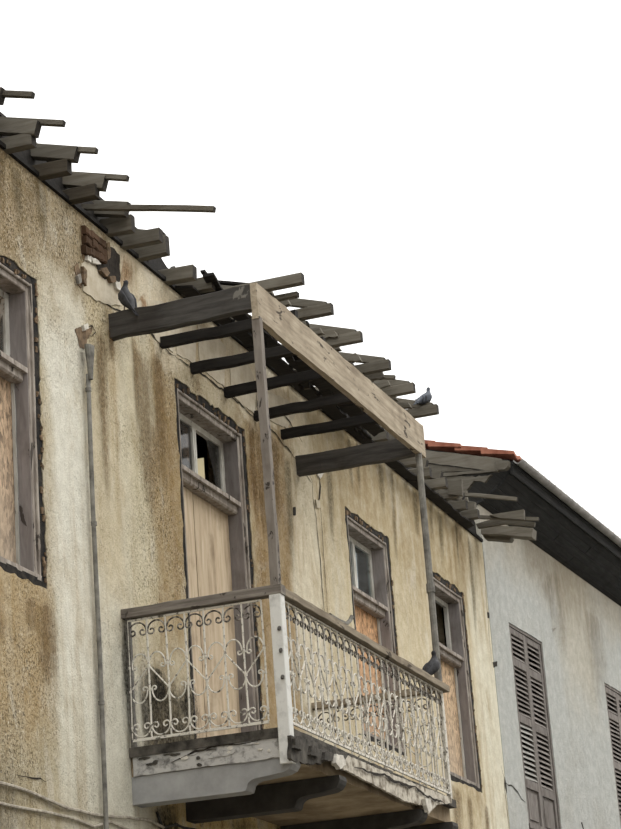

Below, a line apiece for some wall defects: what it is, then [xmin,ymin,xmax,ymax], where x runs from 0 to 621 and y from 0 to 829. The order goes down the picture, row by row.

peeling [74,225,121,306]
leakage [98,339,114,458]
leakage [133,342,165,463]